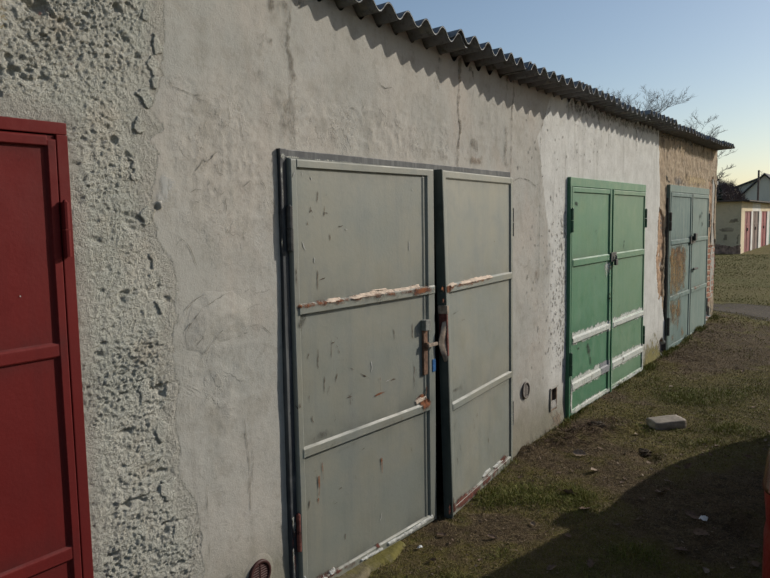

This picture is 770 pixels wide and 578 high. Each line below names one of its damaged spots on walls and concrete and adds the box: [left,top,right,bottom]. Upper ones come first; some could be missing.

spalling [0,0,205,578]
spalling [656,211,664,300]